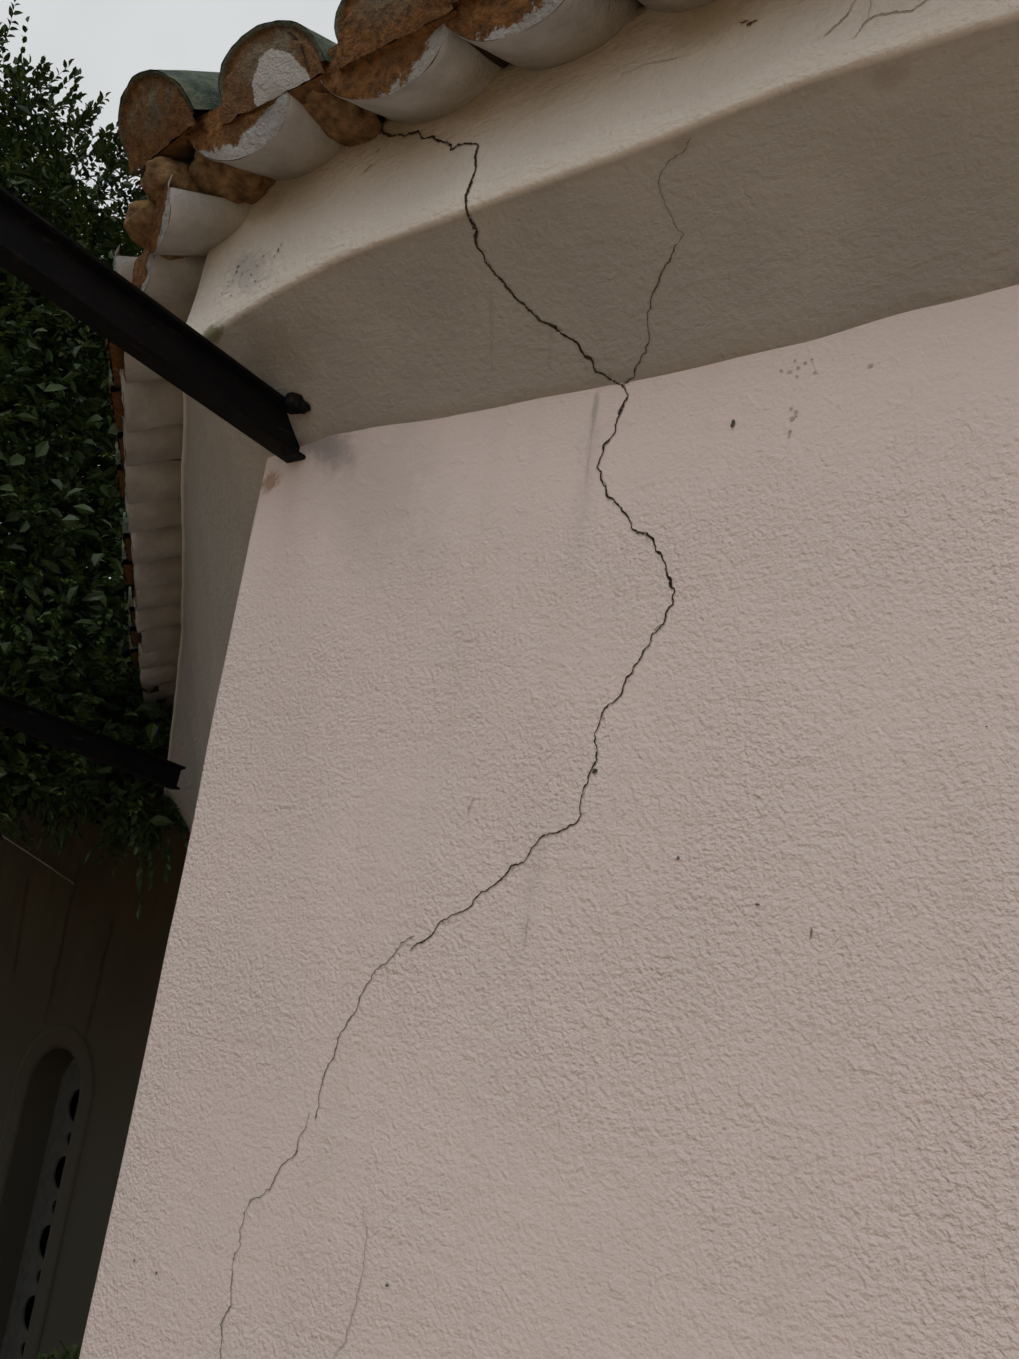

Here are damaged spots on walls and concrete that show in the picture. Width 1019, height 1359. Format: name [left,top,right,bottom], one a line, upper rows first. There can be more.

crack [825,0,926,37]
crack [219,129,691,1359]